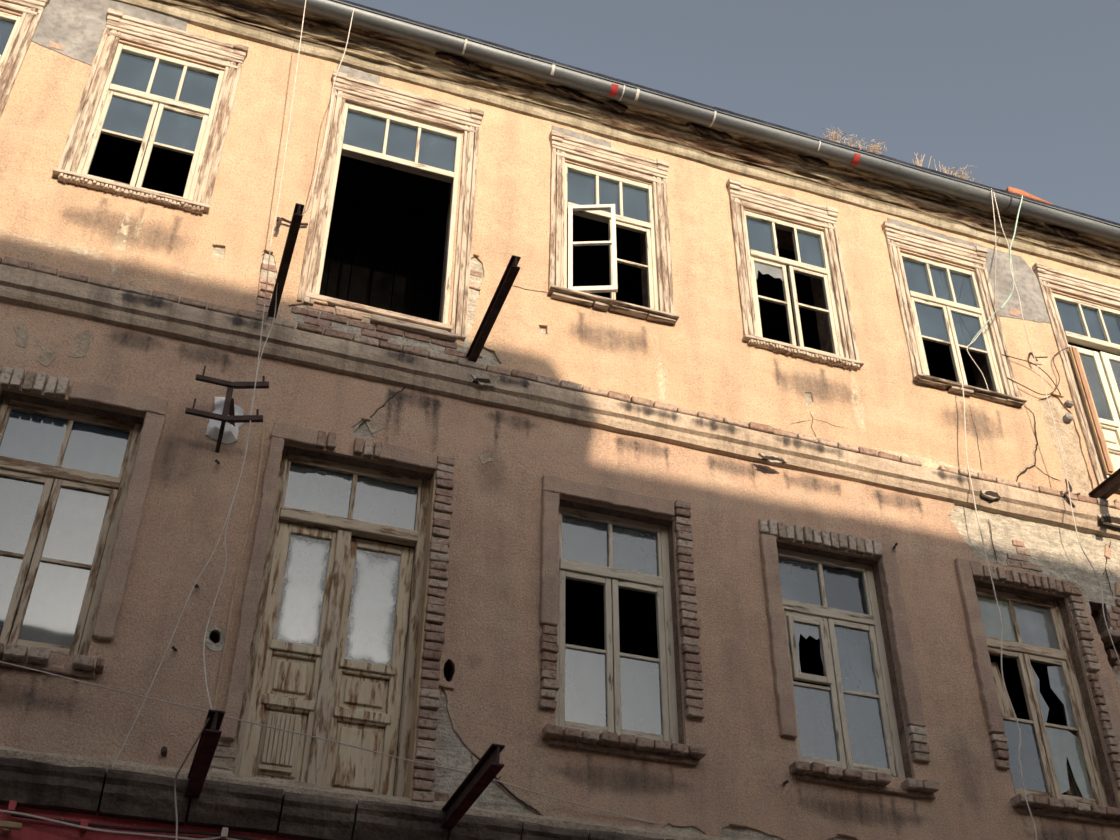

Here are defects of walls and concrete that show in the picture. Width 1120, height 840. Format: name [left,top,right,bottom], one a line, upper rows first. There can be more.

damp [4,213,144,271]
flaking render [255,247,277,320]
flaking render [289,252,500,384]
crack [354,387,405,432]
crack [1014,406,1061,482]
flaking render [949,505,1120,700]